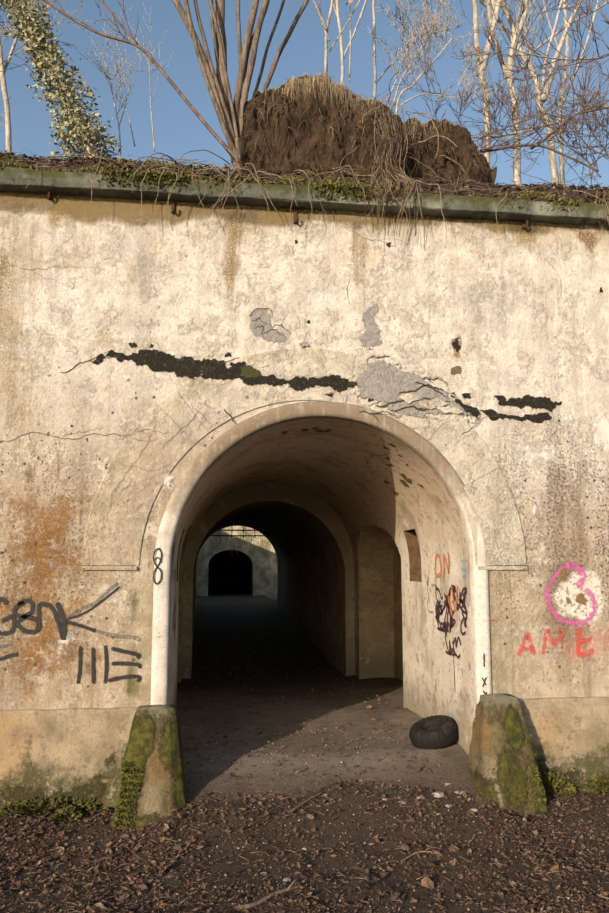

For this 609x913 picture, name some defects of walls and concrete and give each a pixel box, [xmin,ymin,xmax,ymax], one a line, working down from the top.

damp [0,191,596,276]
crack [0,402,237,536]
peeling [383,443,424,496]
spalling [520,434,609,577]
corrosion [9,496,82,692]